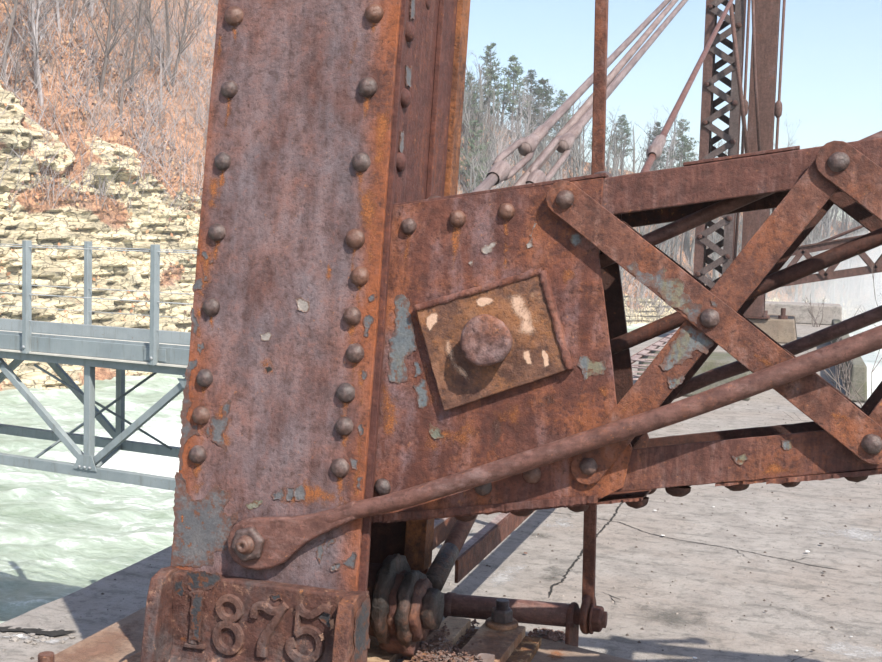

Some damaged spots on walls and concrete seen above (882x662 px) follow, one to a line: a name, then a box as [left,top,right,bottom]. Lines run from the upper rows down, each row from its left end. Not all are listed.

peeling [192,273,208,292]
peeling [427,313,437,330]
peeling [511,296,533,333]
peeling [627,261,718,389]
peeling [388,294,429,408]
peeling [577,356,607,381]
peeling [171,307,306,642]
rust [283,477,343,504]
crack [548,503,847,598]